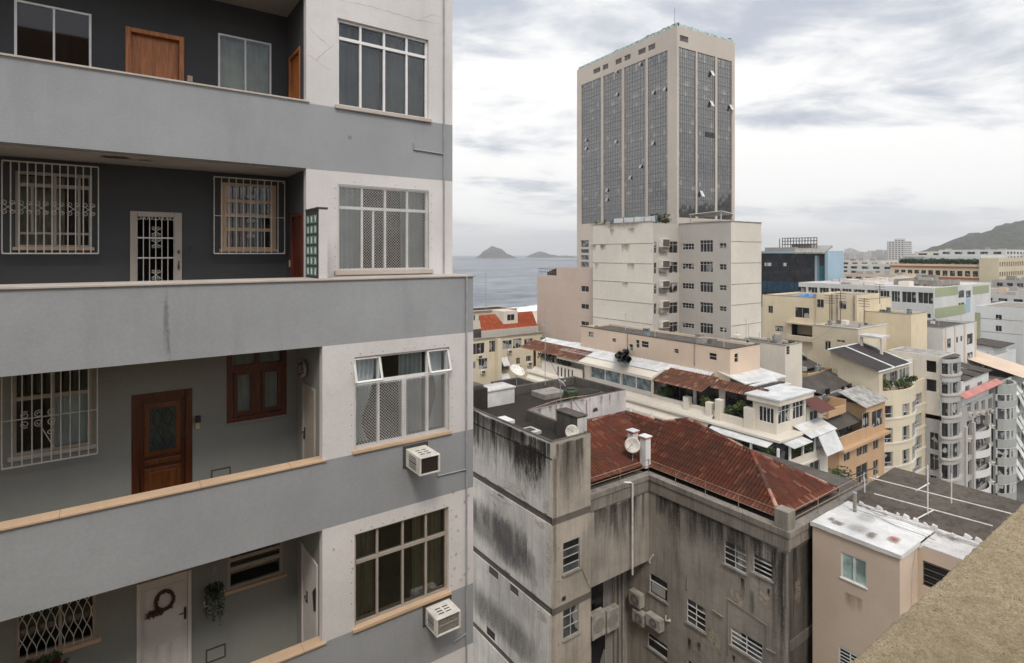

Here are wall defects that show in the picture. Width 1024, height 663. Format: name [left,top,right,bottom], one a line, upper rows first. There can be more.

damp [473,410,582,481]
damp [657,496,813,606]